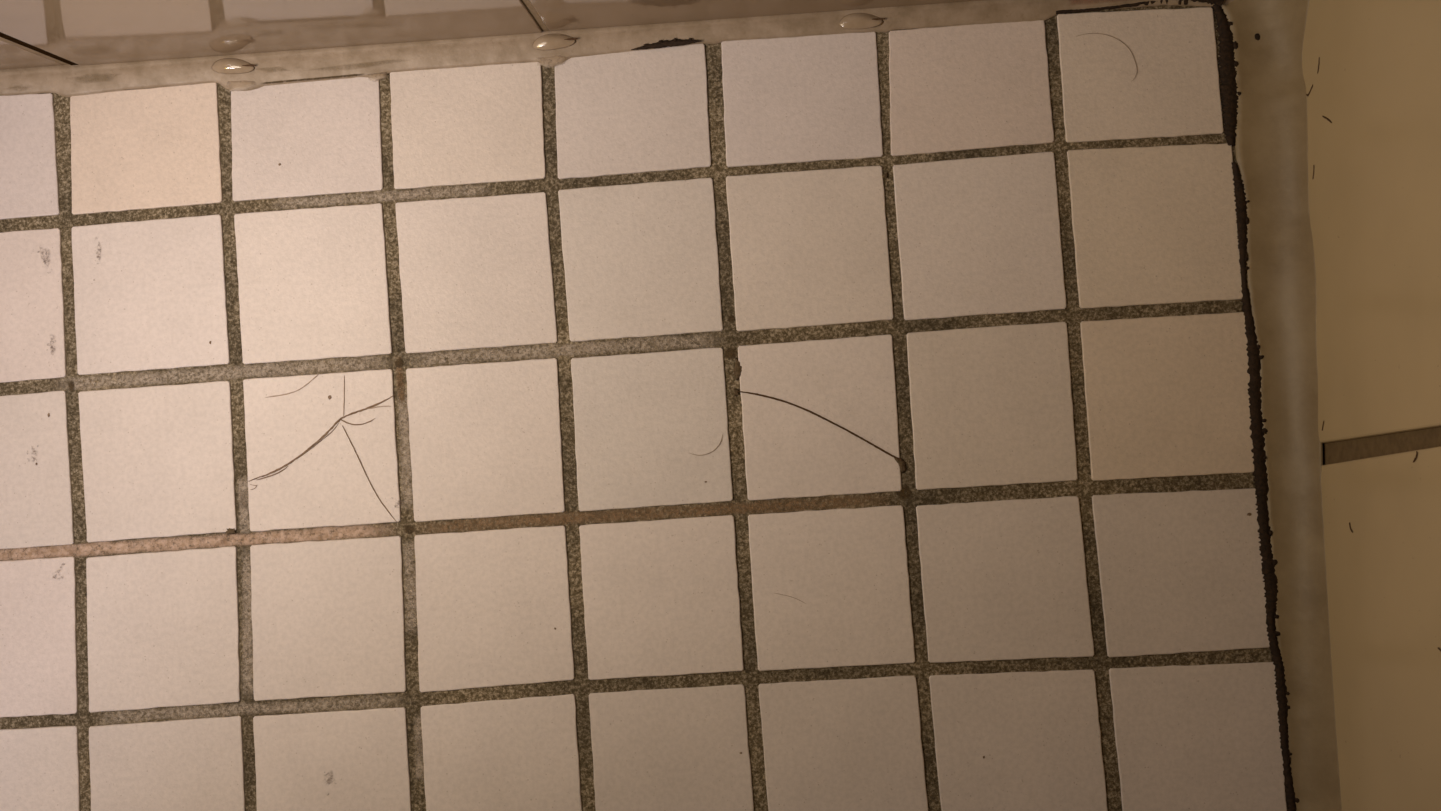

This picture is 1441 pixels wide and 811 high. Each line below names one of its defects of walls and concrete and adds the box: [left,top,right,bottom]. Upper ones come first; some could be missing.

crack [248,375,396,521]
crack [737,391,902,461]